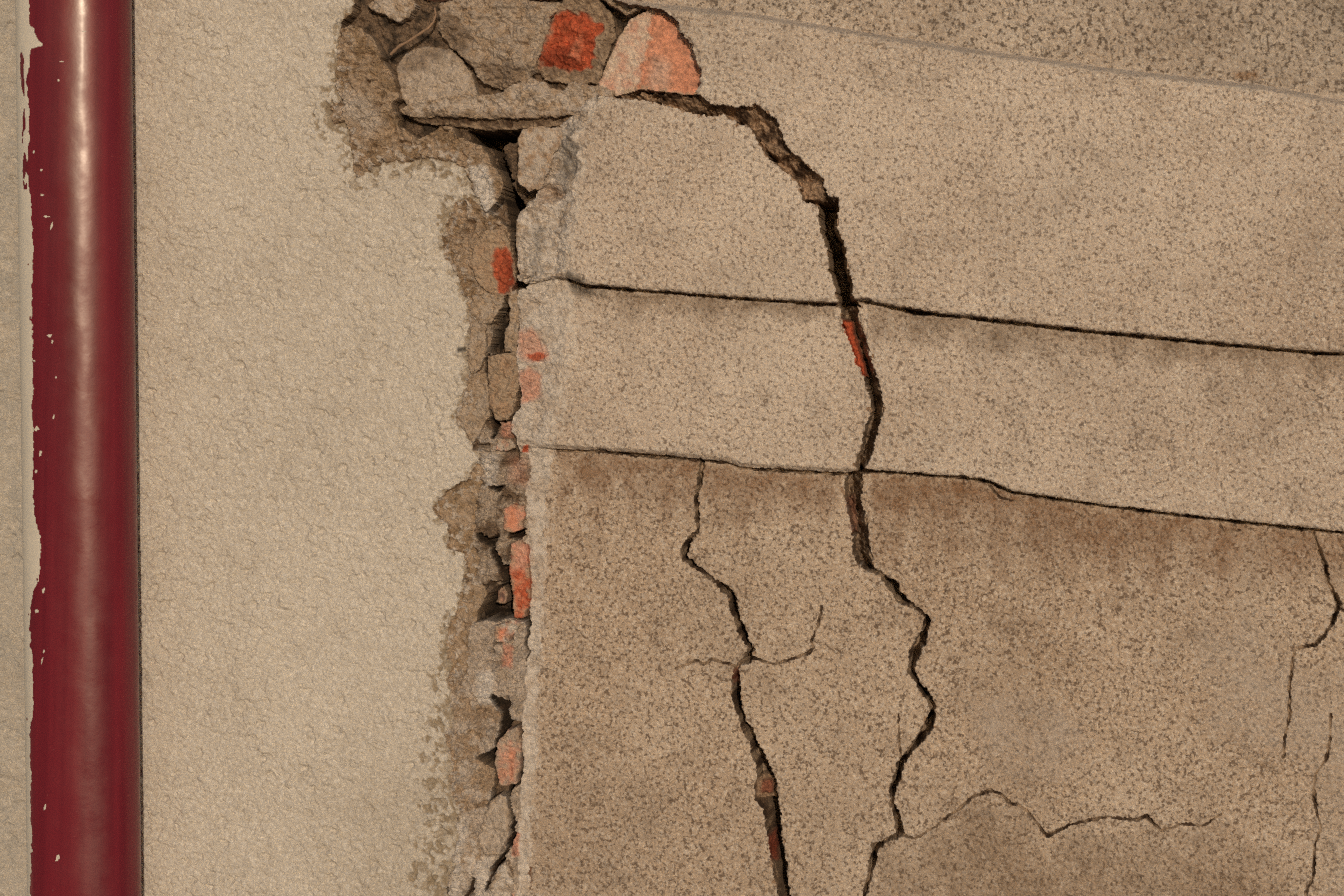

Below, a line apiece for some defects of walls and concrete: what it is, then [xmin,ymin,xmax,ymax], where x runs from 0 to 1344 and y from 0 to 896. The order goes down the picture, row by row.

crack [467,130,530,439]
crack [487,484,506,493]
crack [475,527,528,623]
spalling [330,0,702,896]
crack [556,92,1344,896]
crack [464,694,524,896]